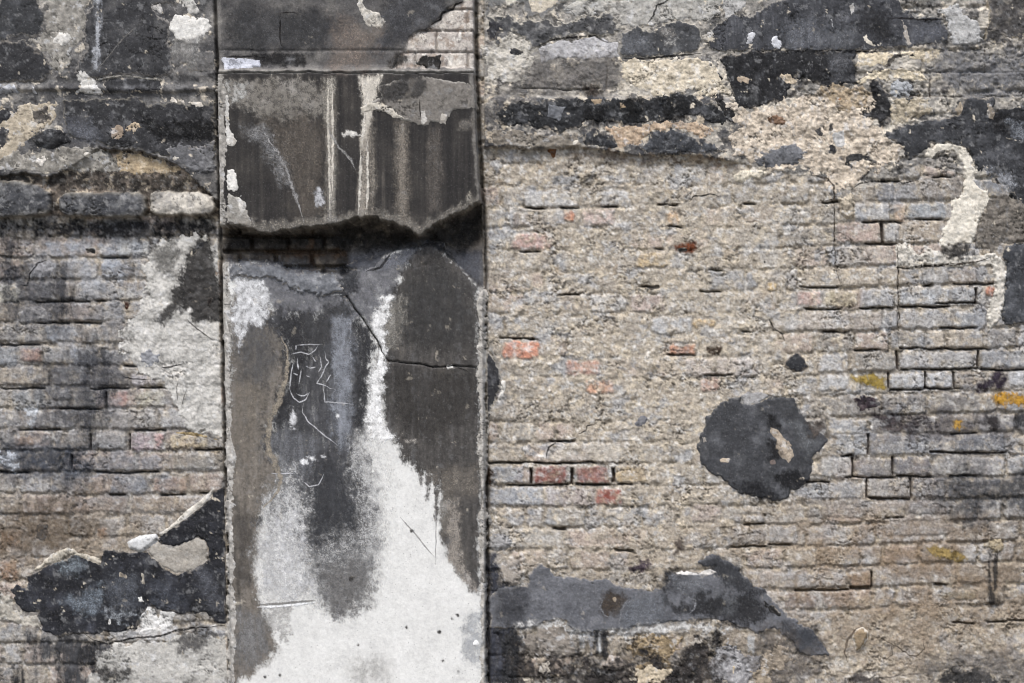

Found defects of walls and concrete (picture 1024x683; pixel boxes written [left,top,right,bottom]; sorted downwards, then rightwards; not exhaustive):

damp [232,23,477,234]
flaking render [0,231,273,683]
damp [263,338,290,508]
damp [272,266,360,318]
crack [346,296,476,371]
flaking render [475,289,830,683]
spalling [853,394,881,411]
flaking render [895,143,1024,332]